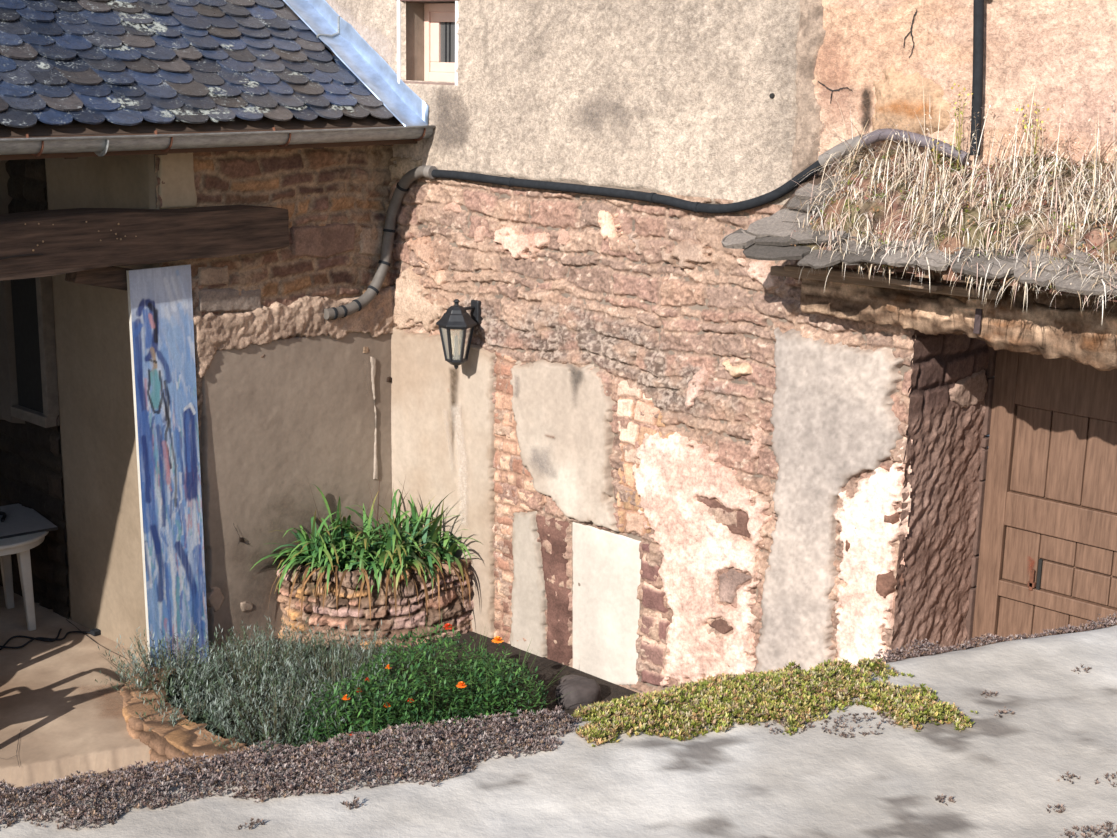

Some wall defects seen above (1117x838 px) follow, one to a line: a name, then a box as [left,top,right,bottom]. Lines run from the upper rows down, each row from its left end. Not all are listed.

crack [903,9,917,58]
crack [818,81,852,103]
flaking render [155,145,916,694]